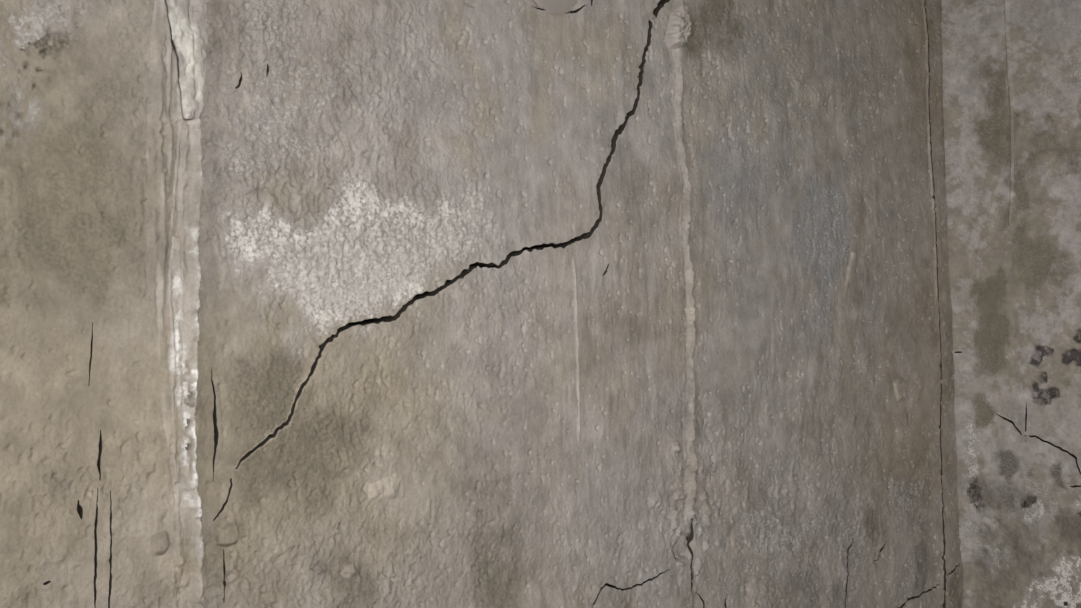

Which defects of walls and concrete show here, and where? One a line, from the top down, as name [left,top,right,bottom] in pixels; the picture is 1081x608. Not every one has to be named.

crack [211,0,670,521]
damp [960,383,1000,570]
damp [1000,452,1064,524]
crack [997,403,1081,488]
crack [220,550,228,600]
crack [592,519,705,608]
damp [1013,556,1081,608]